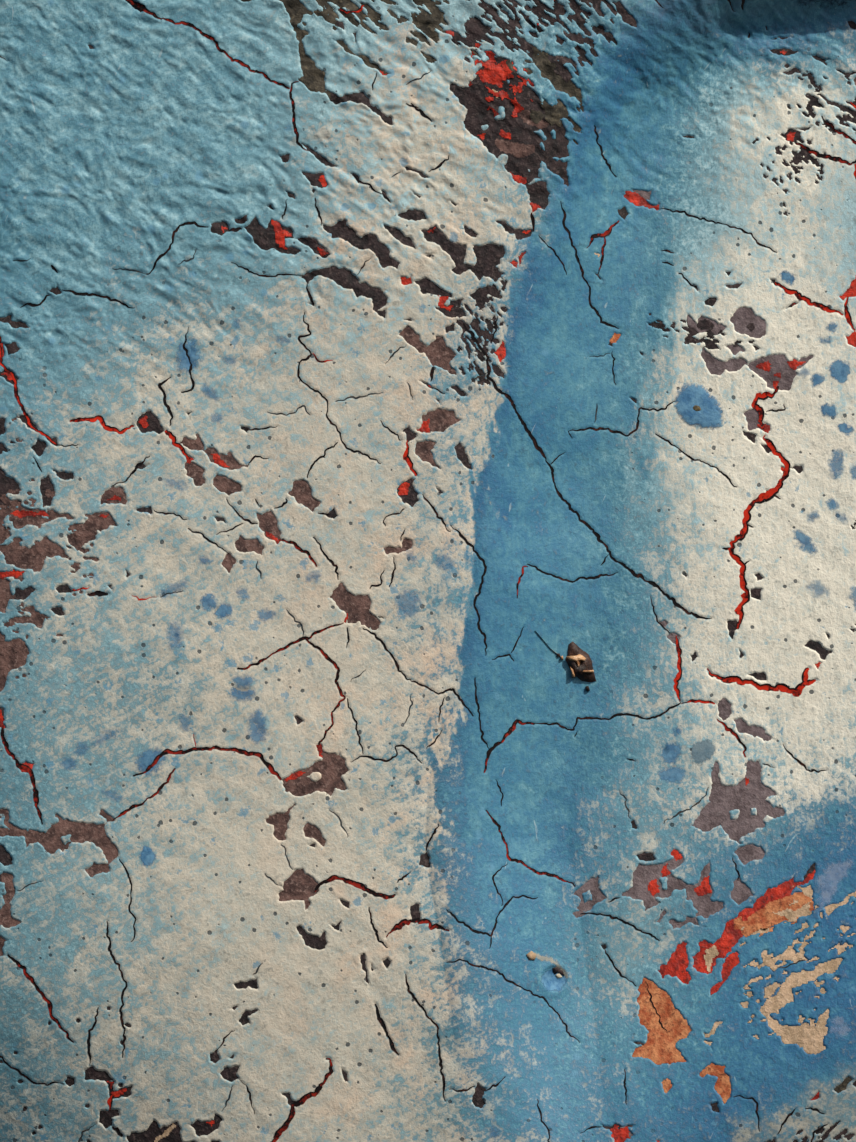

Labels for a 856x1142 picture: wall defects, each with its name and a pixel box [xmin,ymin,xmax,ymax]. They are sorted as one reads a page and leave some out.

crack [0,258,135,447]
crack [181,327,195,393]
crack [268,312,413,478]
peeling [147,0,637,526]
peeling [648,250,813,391]
peeling [0,377,422,950]
crack [360,323,825,1108]
peeling [0,768,176,1043]
peeling [573,761,856,1065]
peeling [0,1006,258,1142]
peeling [271,1058,348,1142]
crack [537,1099,550,1142]